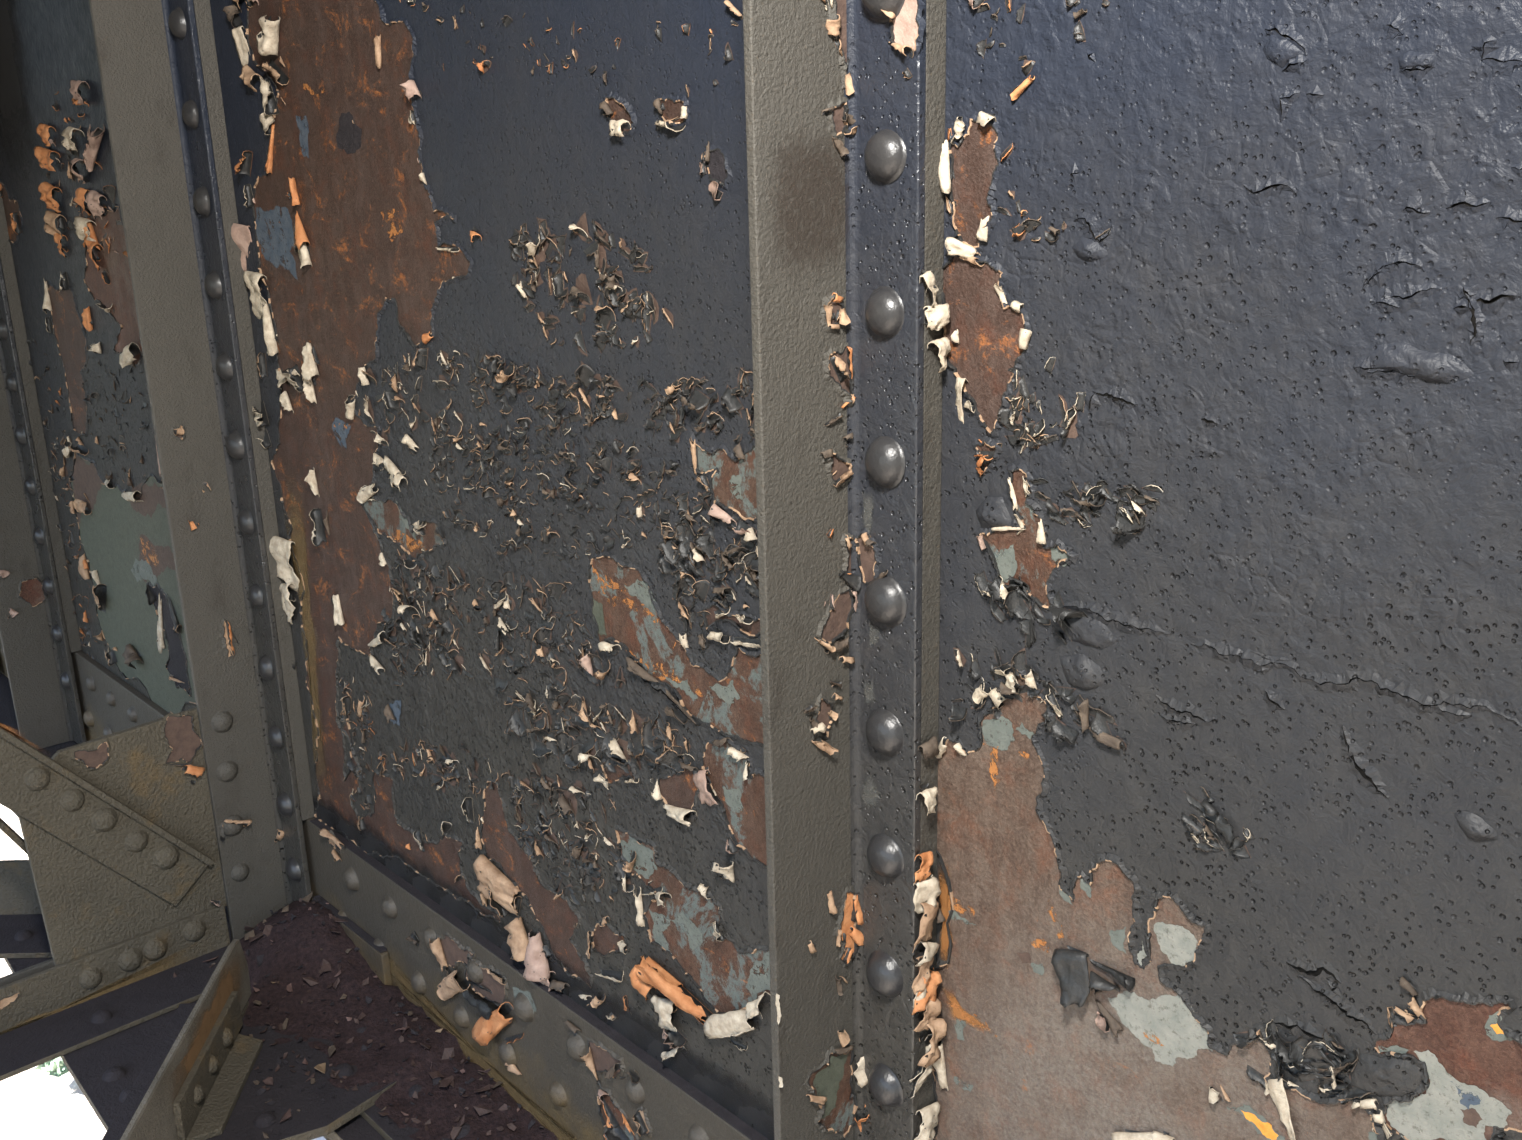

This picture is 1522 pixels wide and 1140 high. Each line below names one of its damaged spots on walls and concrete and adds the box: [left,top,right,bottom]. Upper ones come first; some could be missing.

peeling [968,0,1035,100]
peeling [1065,0,1110,42]
peeling [0,178,23,246]
peeling [26,80,207,785]
peeling [219,0,781,1062]
peeling [909,111,1522,1140]
crack [1063,601,1522,799]
rust [939,880,952,958]
rust [949,995,985,1027]
peeling [314,1045,340,1078]